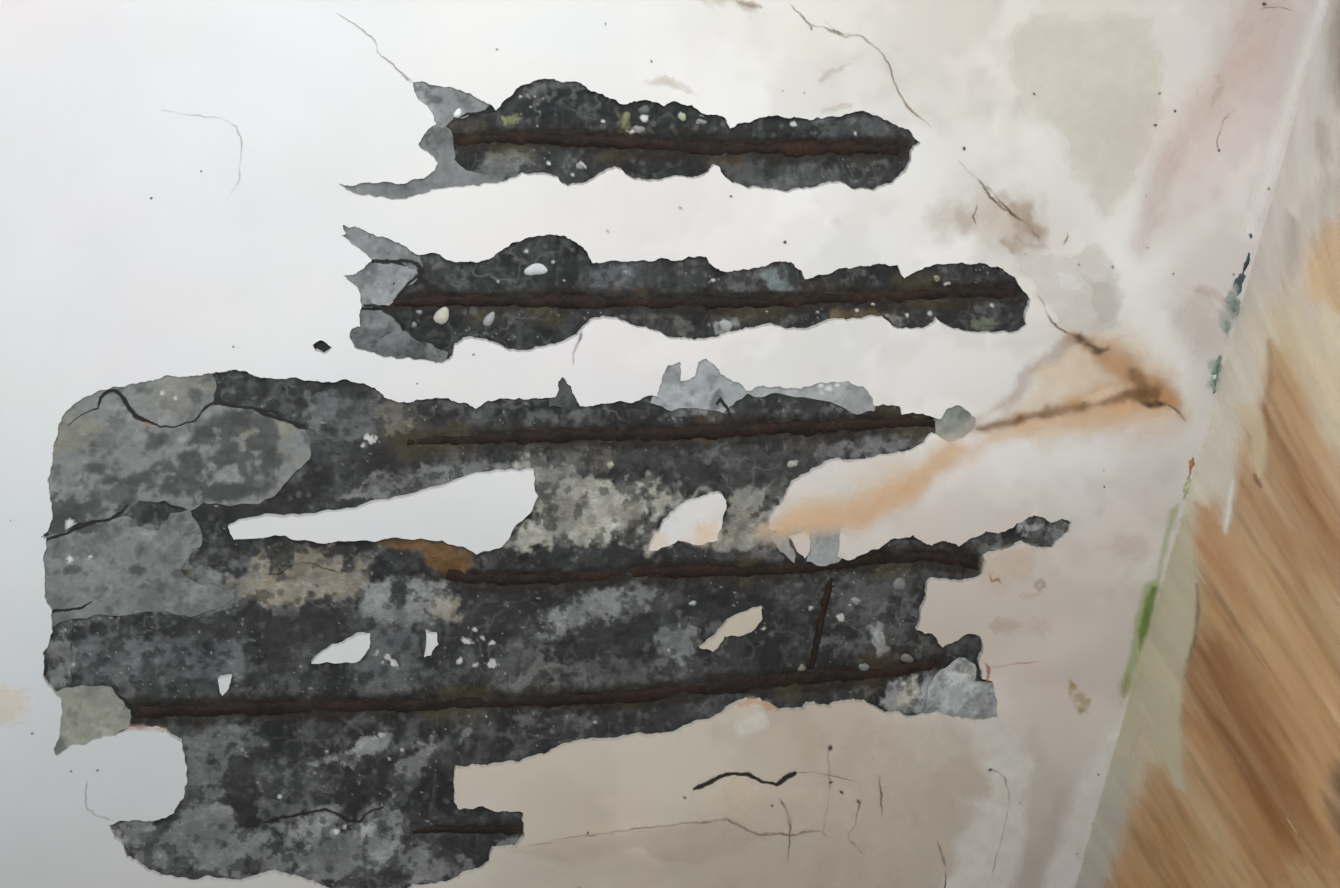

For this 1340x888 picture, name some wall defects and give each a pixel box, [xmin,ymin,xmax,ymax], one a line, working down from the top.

crack [884,56,918,116]
spalling [341,79,919,200]
crack [973,187,1014,220]
spalling [343,225,1029,363]
spalling [313,340,331,352]
rust [976,333,1179,440]
rust [778,444,964,533]
rust [651,533,665,548]
spalling [43,359,1070,888]
crack [693,771,883,848]